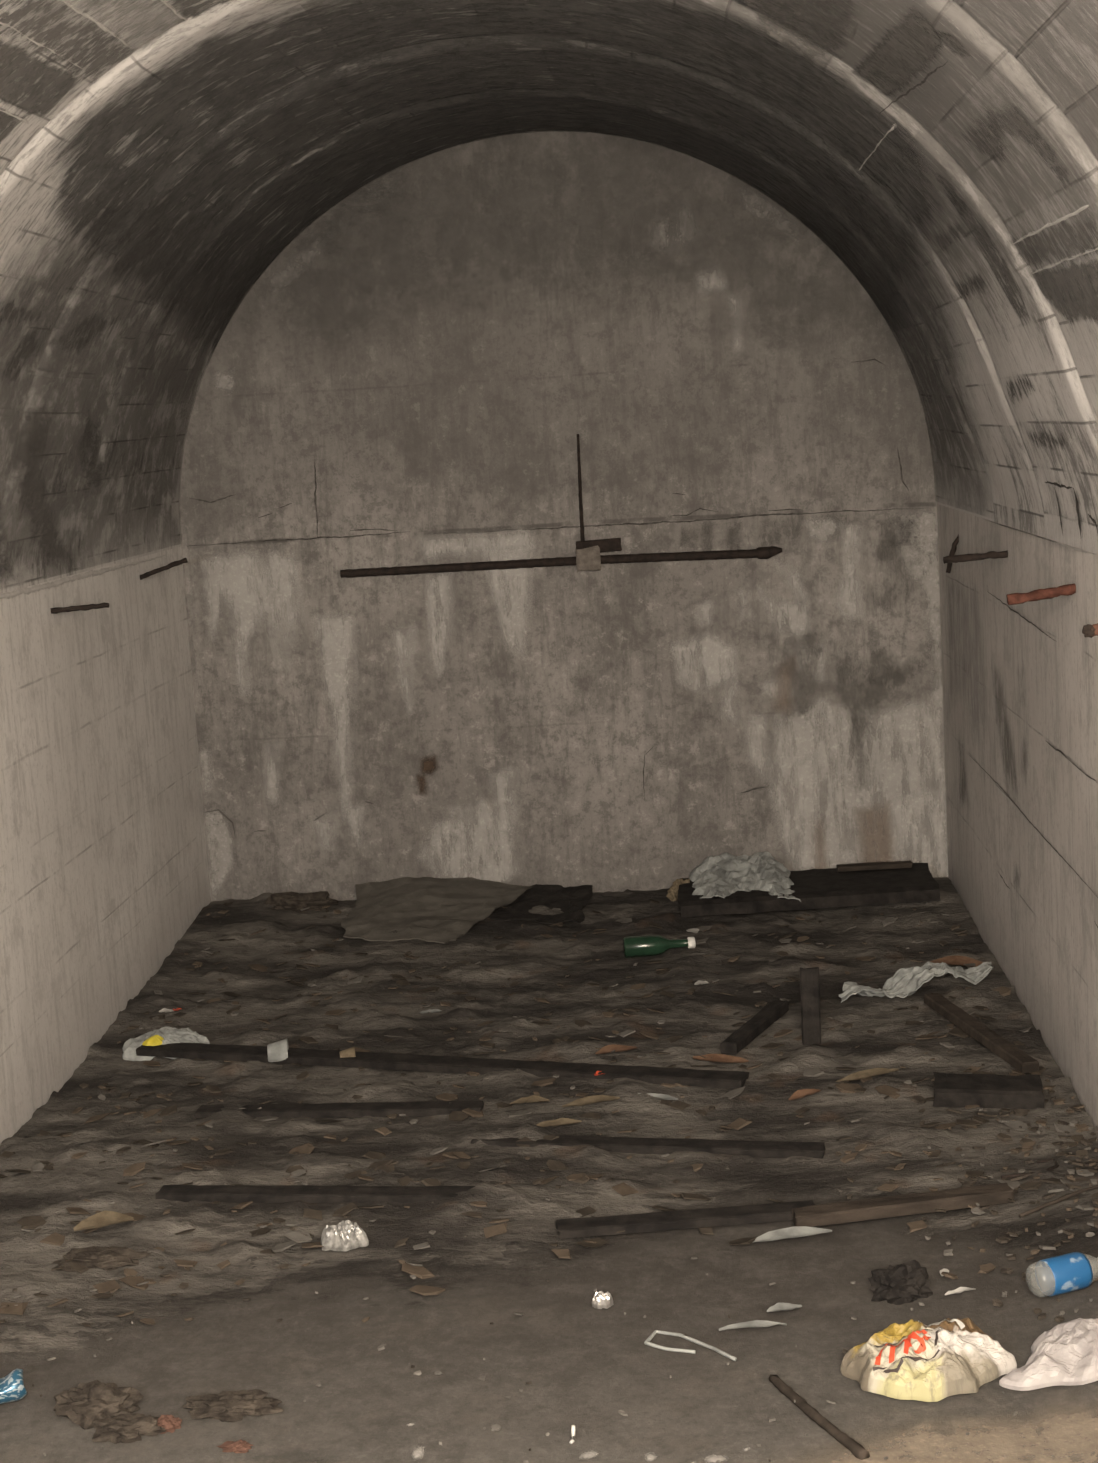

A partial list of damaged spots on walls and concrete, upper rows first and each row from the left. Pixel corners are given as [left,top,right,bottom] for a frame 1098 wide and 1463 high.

leakage [428,577,450,664]
leakage [426,532,531,648]
leakage [675,605,736,715]
leakage [431,774,513,882]